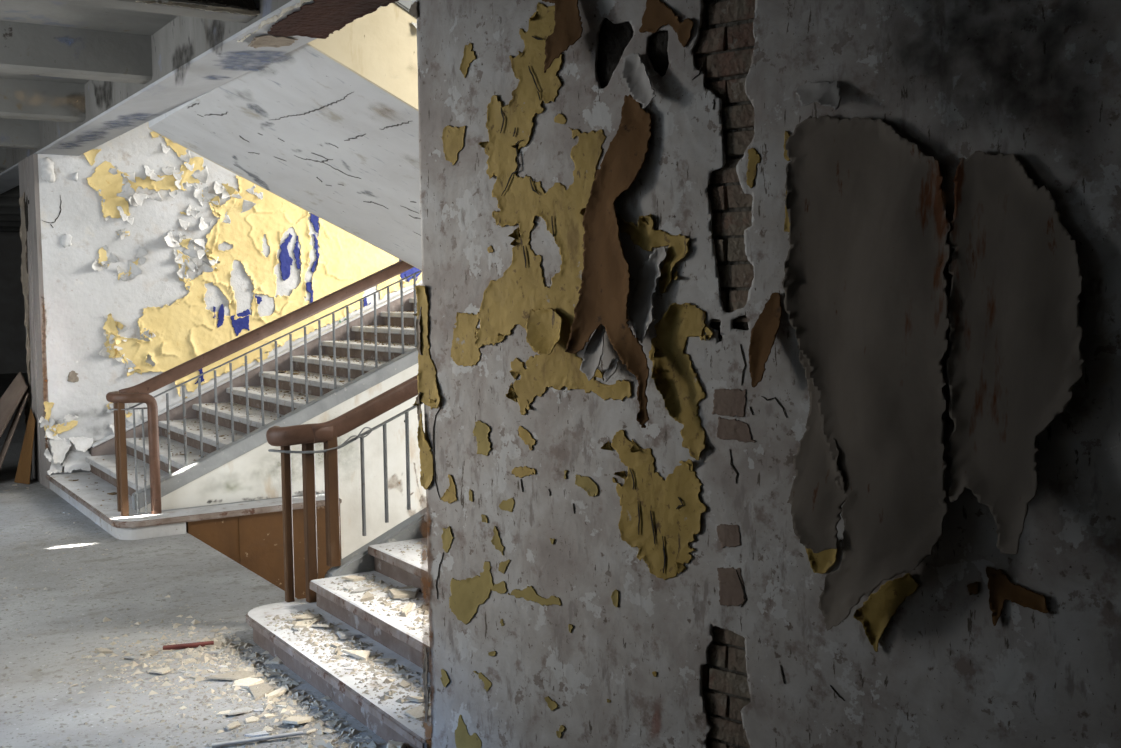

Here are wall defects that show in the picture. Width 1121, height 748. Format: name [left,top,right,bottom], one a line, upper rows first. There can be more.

flaking render [409,1,419,29]
peeling [19,192,78,440]
peeling [83,131,441,490]
peeling [475,0,1085,652]
flaking render [702,626,751,748]